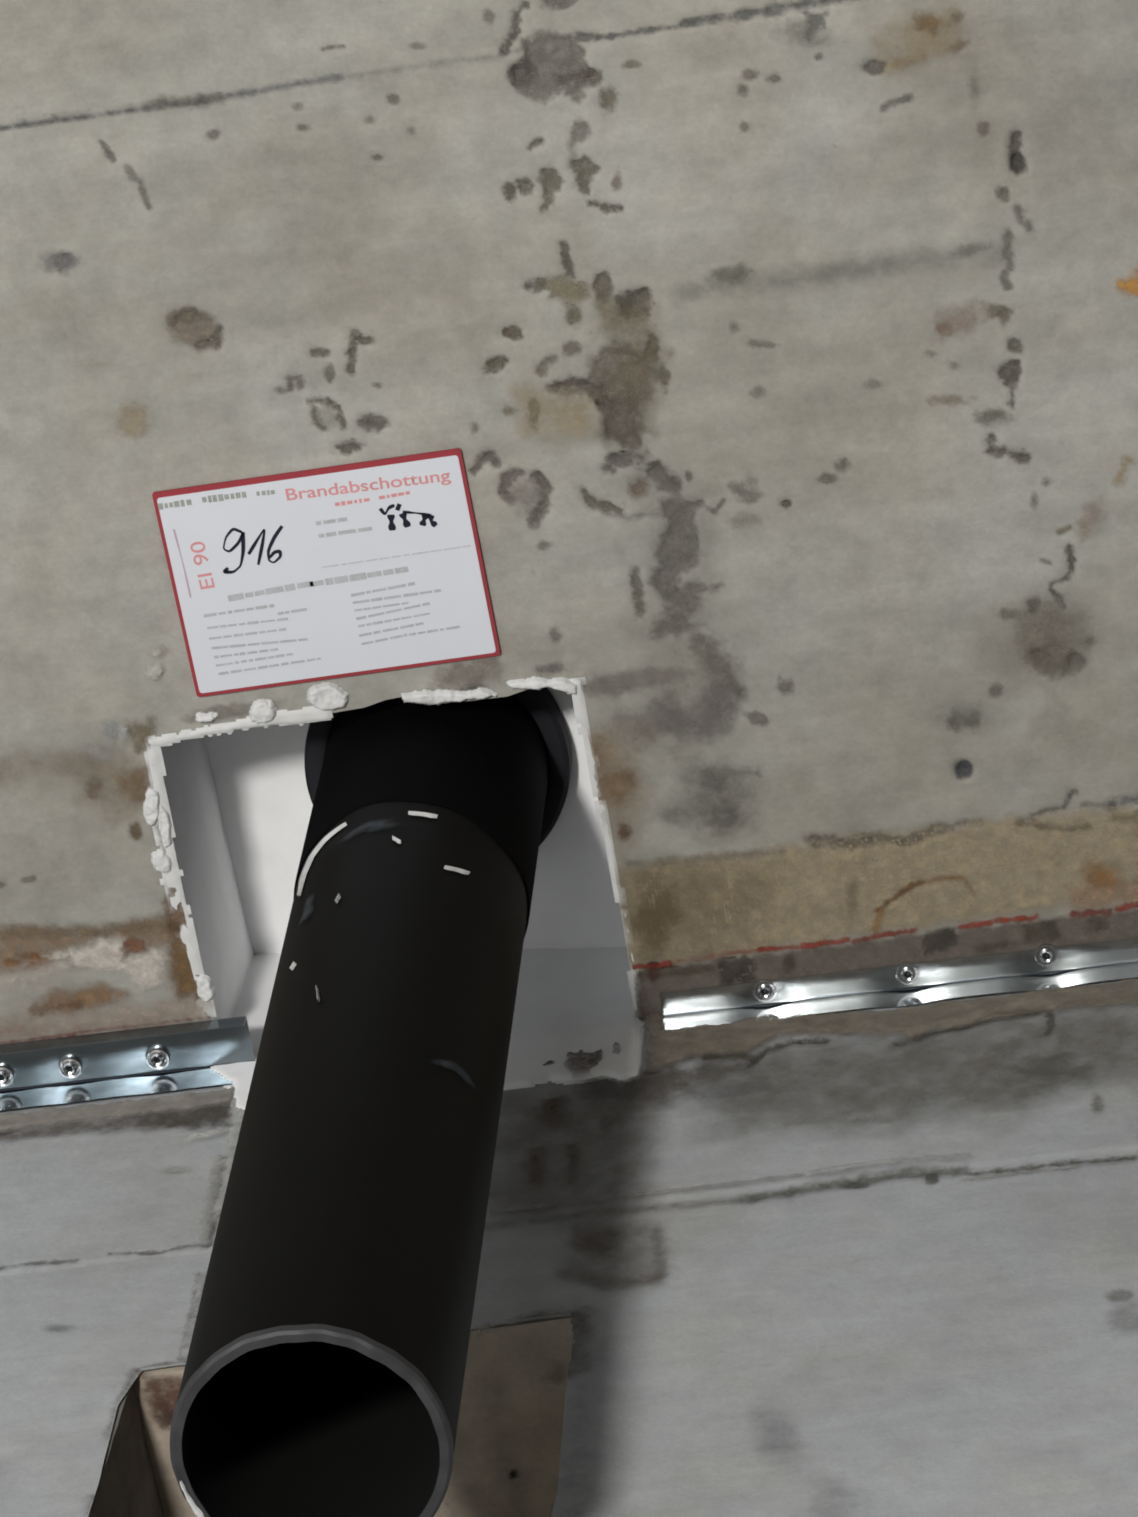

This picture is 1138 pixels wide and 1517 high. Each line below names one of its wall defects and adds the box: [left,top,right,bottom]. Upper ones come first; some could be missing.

crack [596,0,840,40]
crack [0,90,257,130]
corrosion [1117,278,1138,295]
water stain [442,656,496,691]
corrosion [127,720,153,753]
corrosion [130,824,140,840]
corrosion [0,887,197,998]
corrosion [5,985,122,1032]
crack [491,1153,1136,1220]
crack [0,1244,208,1269]